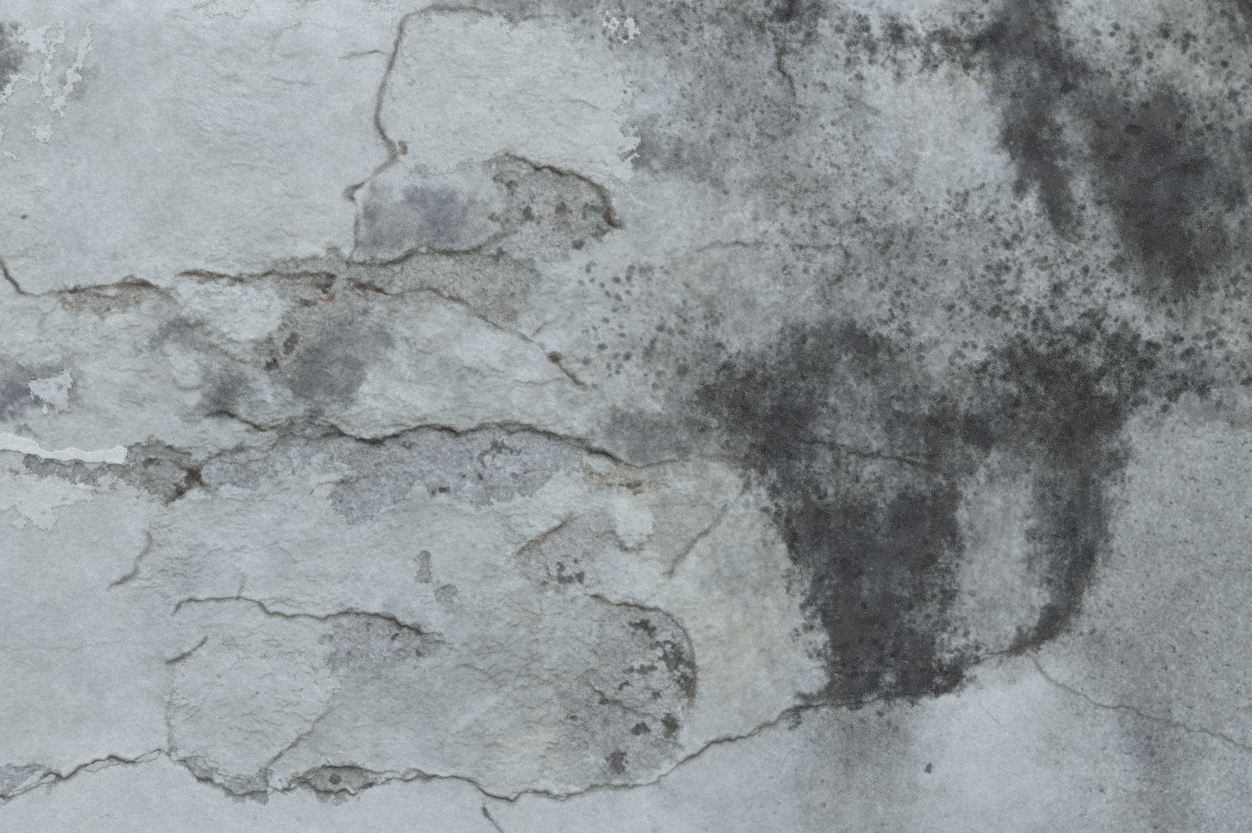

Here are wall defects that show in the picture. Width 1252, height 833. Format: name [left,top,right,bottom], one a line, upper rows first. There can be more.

peeling [226,5,642,384]
crack [511,157,586,181]
crack [2,267,27,295]
leakage [683,0,1252,730]
spalling [0,414,669,534]
crack [316,433,399,445]
crack [586,446,616,461]
spalling [414,551,459,603]
spalling [516,506,617,601]
peeling [159,609,444,806]
spalling [562,601,699,785]
crack [0,750,160,798]